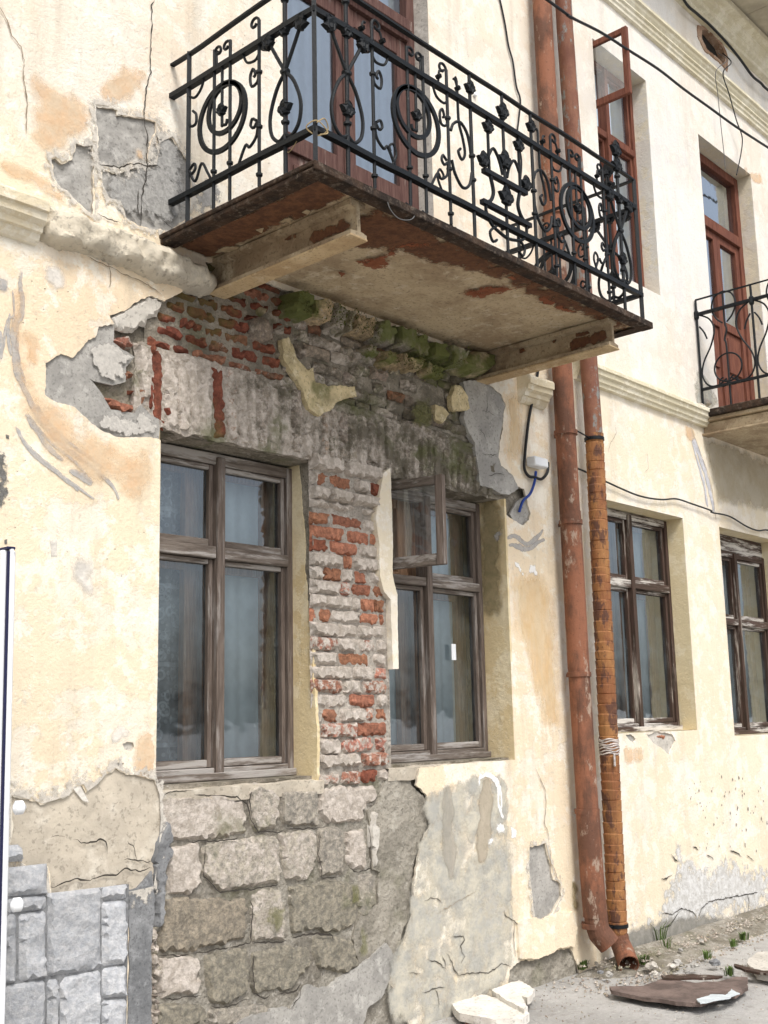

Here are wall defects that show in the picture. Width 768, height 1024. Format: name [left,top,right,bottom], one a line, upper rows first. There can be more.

spalling [44,95,198,238]
crack [98,0,171,227]
spalling [508,497,529,525]
spalling [8,283,496,1024]
crack [52,835,150,888]
crack [413,915,517,1009]
peeling [508,841,578,988]
crack [661,892,757,929]